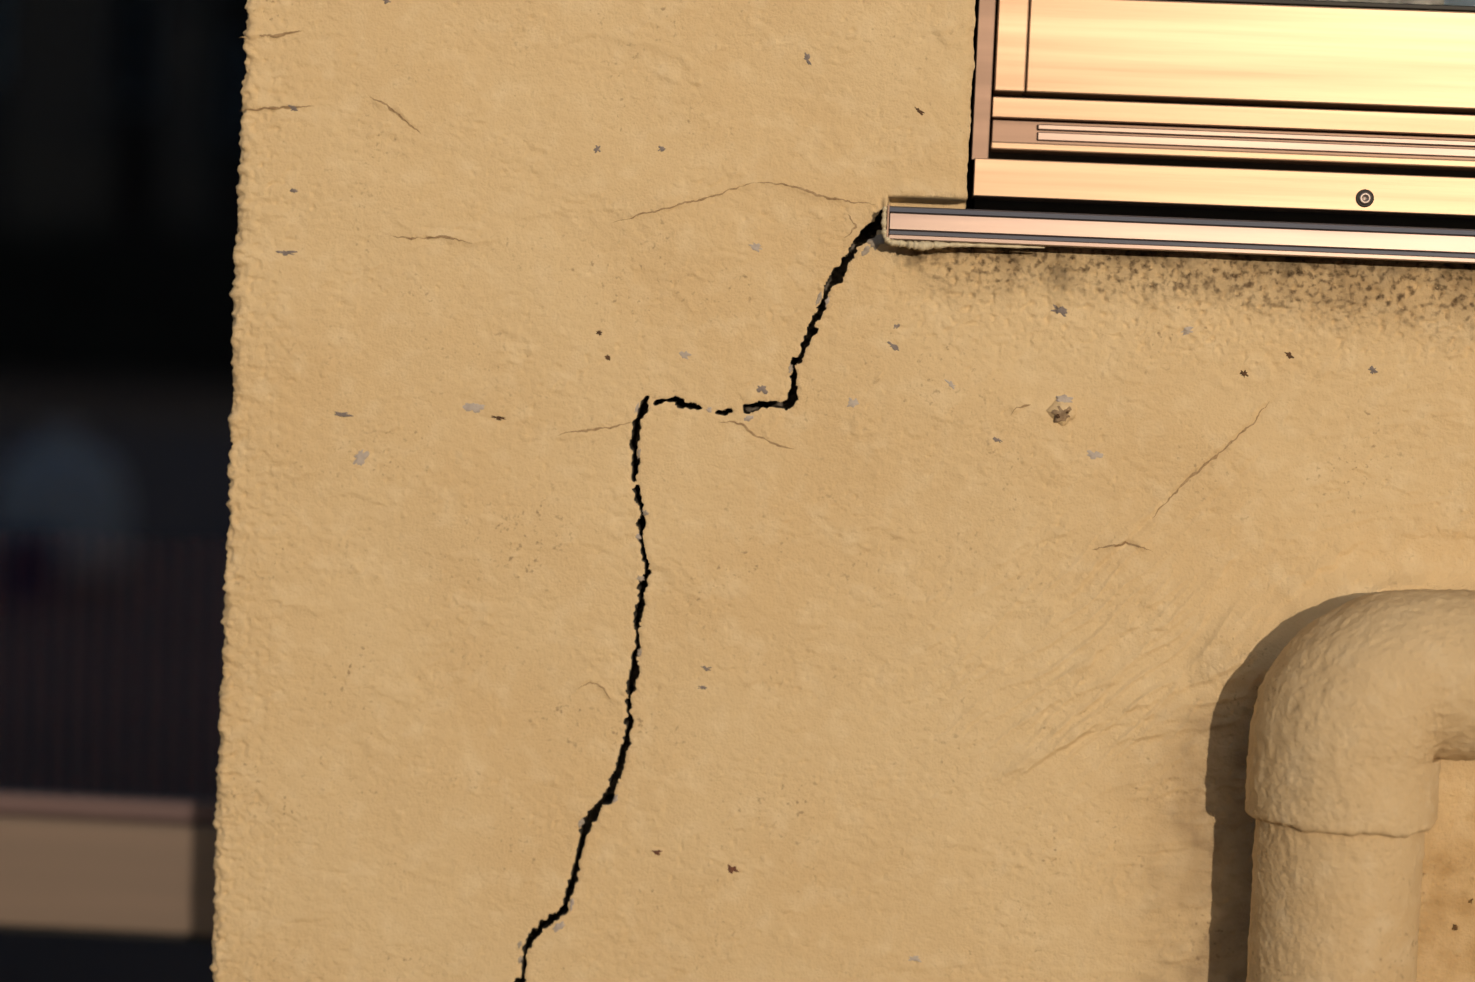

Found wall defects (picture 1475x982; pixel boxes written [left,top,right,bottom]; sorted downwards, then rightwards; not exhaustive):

crack [514,182,885,982]